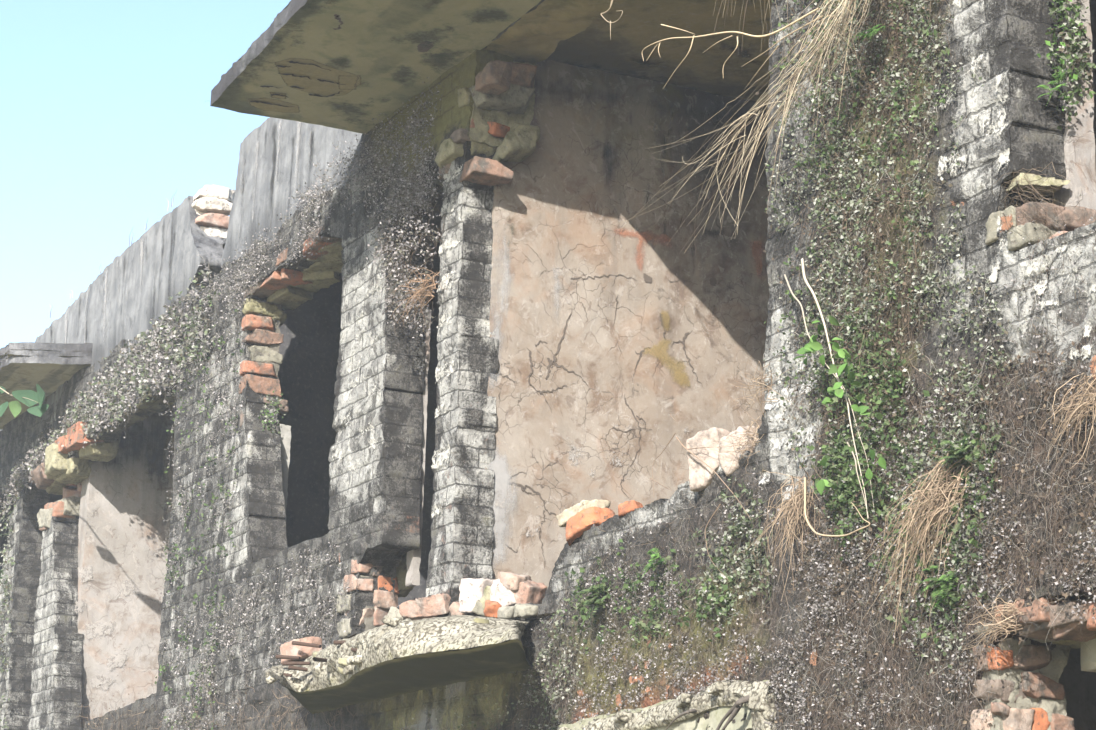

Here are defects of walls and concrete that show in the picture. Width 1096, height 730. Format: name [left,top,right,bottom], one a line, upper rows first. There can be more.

crack [570,274,637,325]
crack [497,312,588,412]
crack [612,329,703,498]
crack [505,472,556,568]
spalling [265,552,547,692]
spalling [629,661,653,694]
spalling [557,680,776,730]